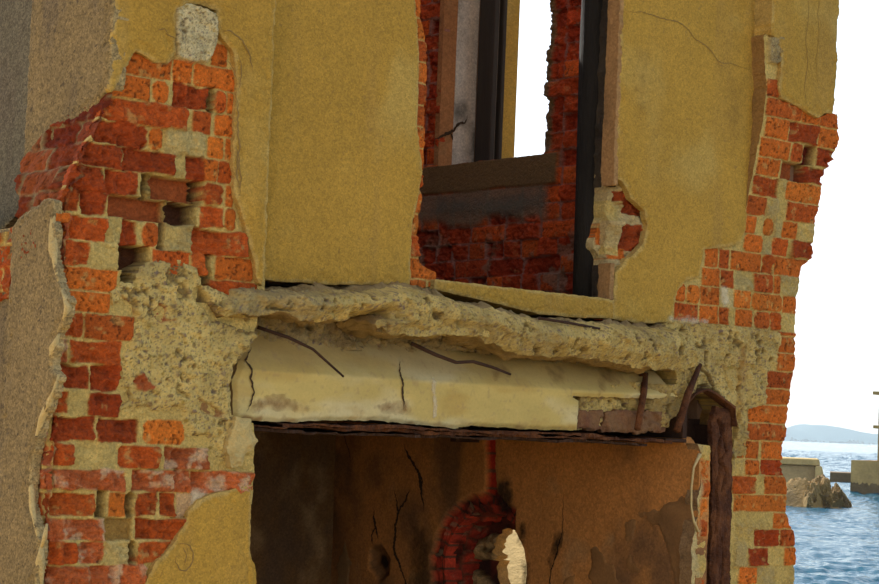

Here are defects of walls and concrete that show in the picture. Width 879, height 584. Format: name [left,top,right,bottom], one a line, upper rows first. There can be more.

crack [624,10,743,68]
flaking render [415,0,427,171]
flaking render [0,227,36,302]
flaking render [14,3,265,584]
flaking render [192,34,839,584]
crack [244,348,255,407]
crack [398,364,406,407]
crack [371,445,424,584]
crack [549,496,564,584]